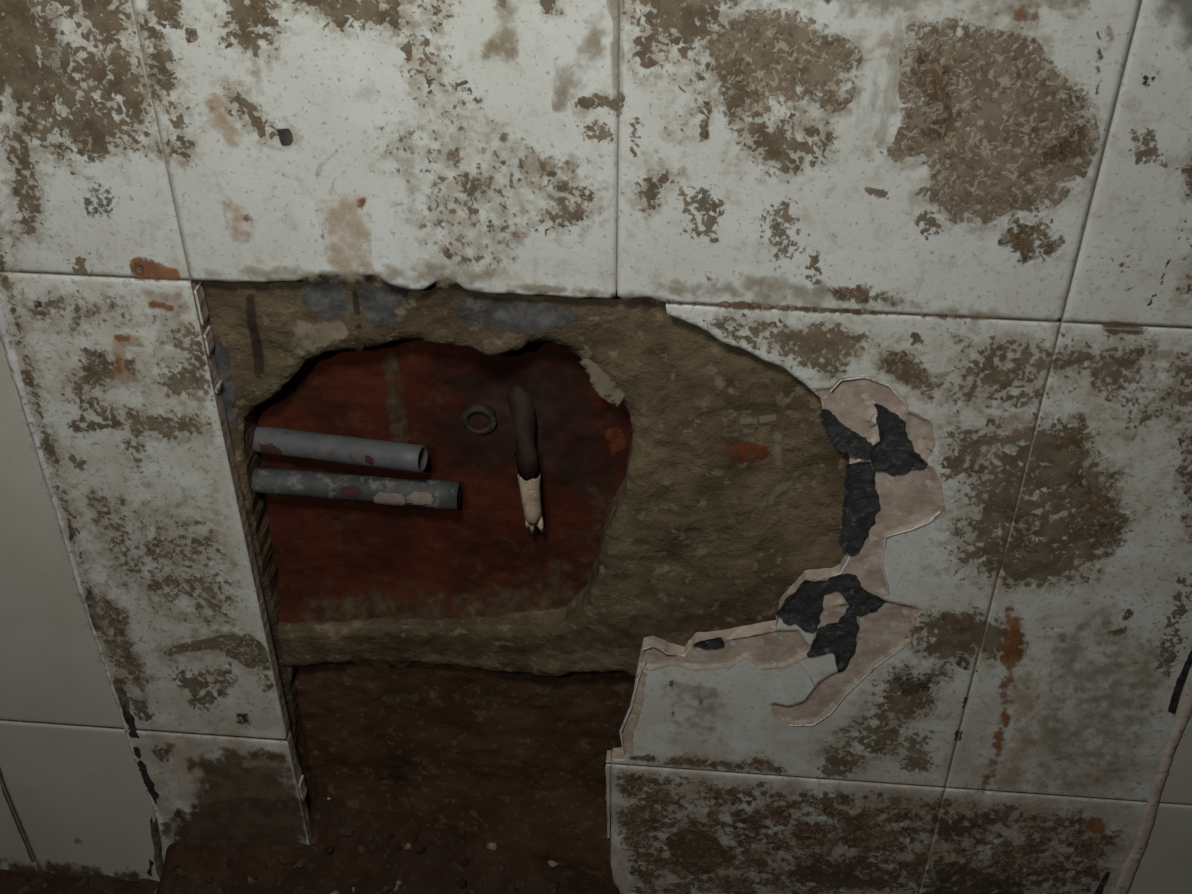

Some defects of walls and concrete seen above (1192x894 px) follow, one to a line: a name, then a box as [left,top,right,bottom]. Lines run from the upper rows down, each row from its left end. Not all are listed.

water stain [0,0,198,471]
rust [130,257,180,280]
rust [148,294,179,311]
water stain [215,0,601,282]
water stain [585,0,862,183]
water stain [665,197,1192,592]
mould [880,18,1106,263]
crack [0,768,36,863]
water stain [53,486,273,724]
spalling [198,274,945,884]
water stain [612,606,1121,894]
rust [976,606,1028,792]